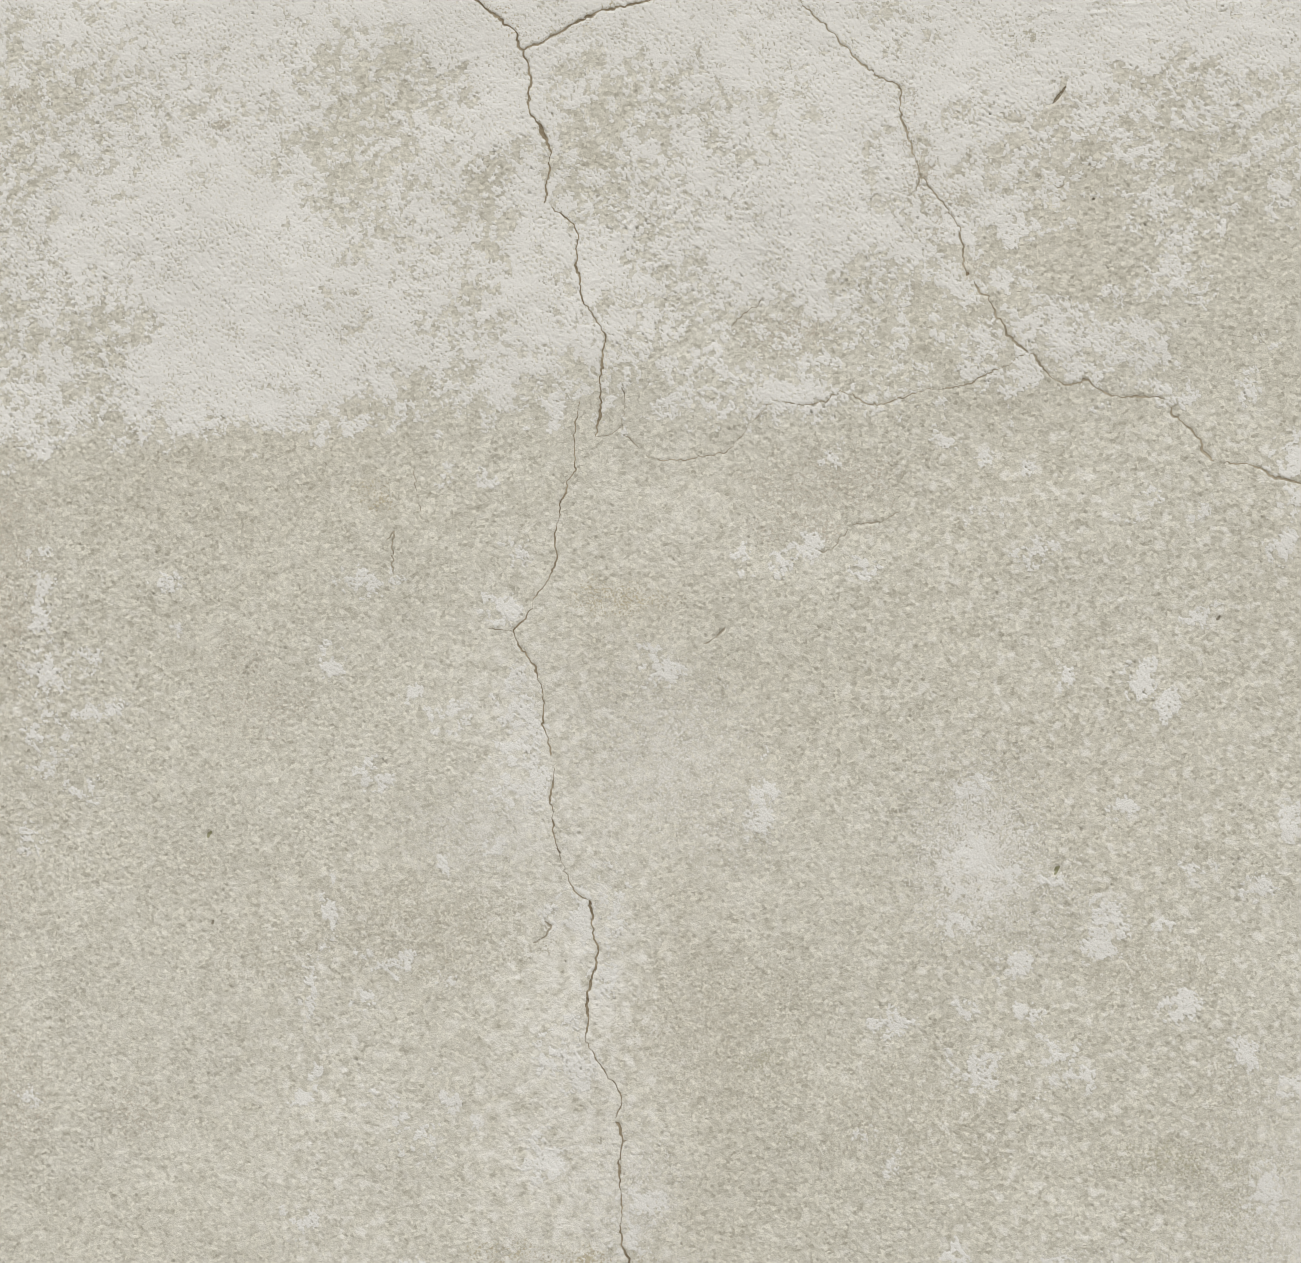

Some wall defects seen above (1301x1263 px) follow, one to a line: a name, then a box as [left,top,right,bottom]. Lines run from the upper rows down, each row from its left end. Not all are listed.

crack [475,0,1301,1263]